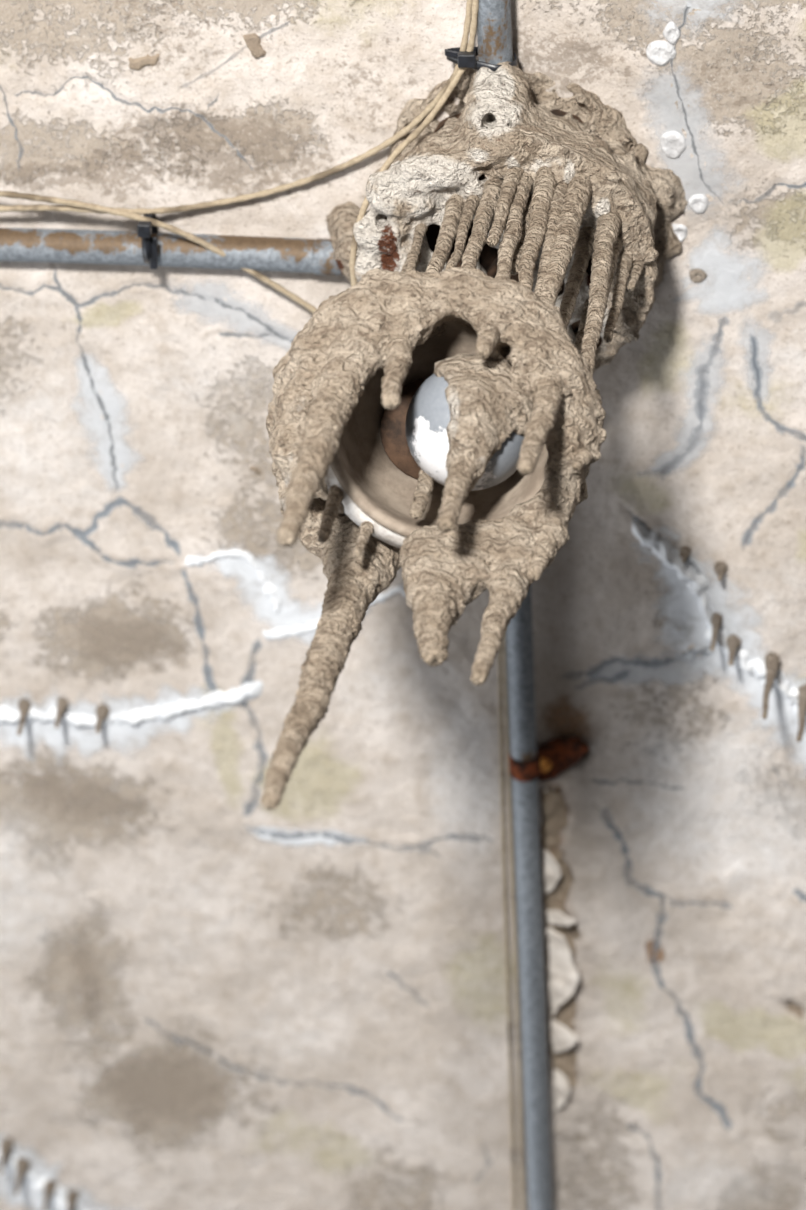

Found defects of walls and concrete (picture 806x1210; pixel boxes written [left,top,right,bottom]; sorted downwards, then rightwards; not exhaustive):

crack [4,76,253,170]
crack [777,181,806,189]
crack [695,378,707,426]
crack [716,318,806,544]
crack [4,268,293,709]
crack [585,657,668,683]
efflorescence [593,521,806,762]
efflorescence [0,680,263,757]
crack [244,741,352,844]
crack [793,890,806,902]
crack [606,822,732,1129]
efflorescence [0,1138,109,1210]